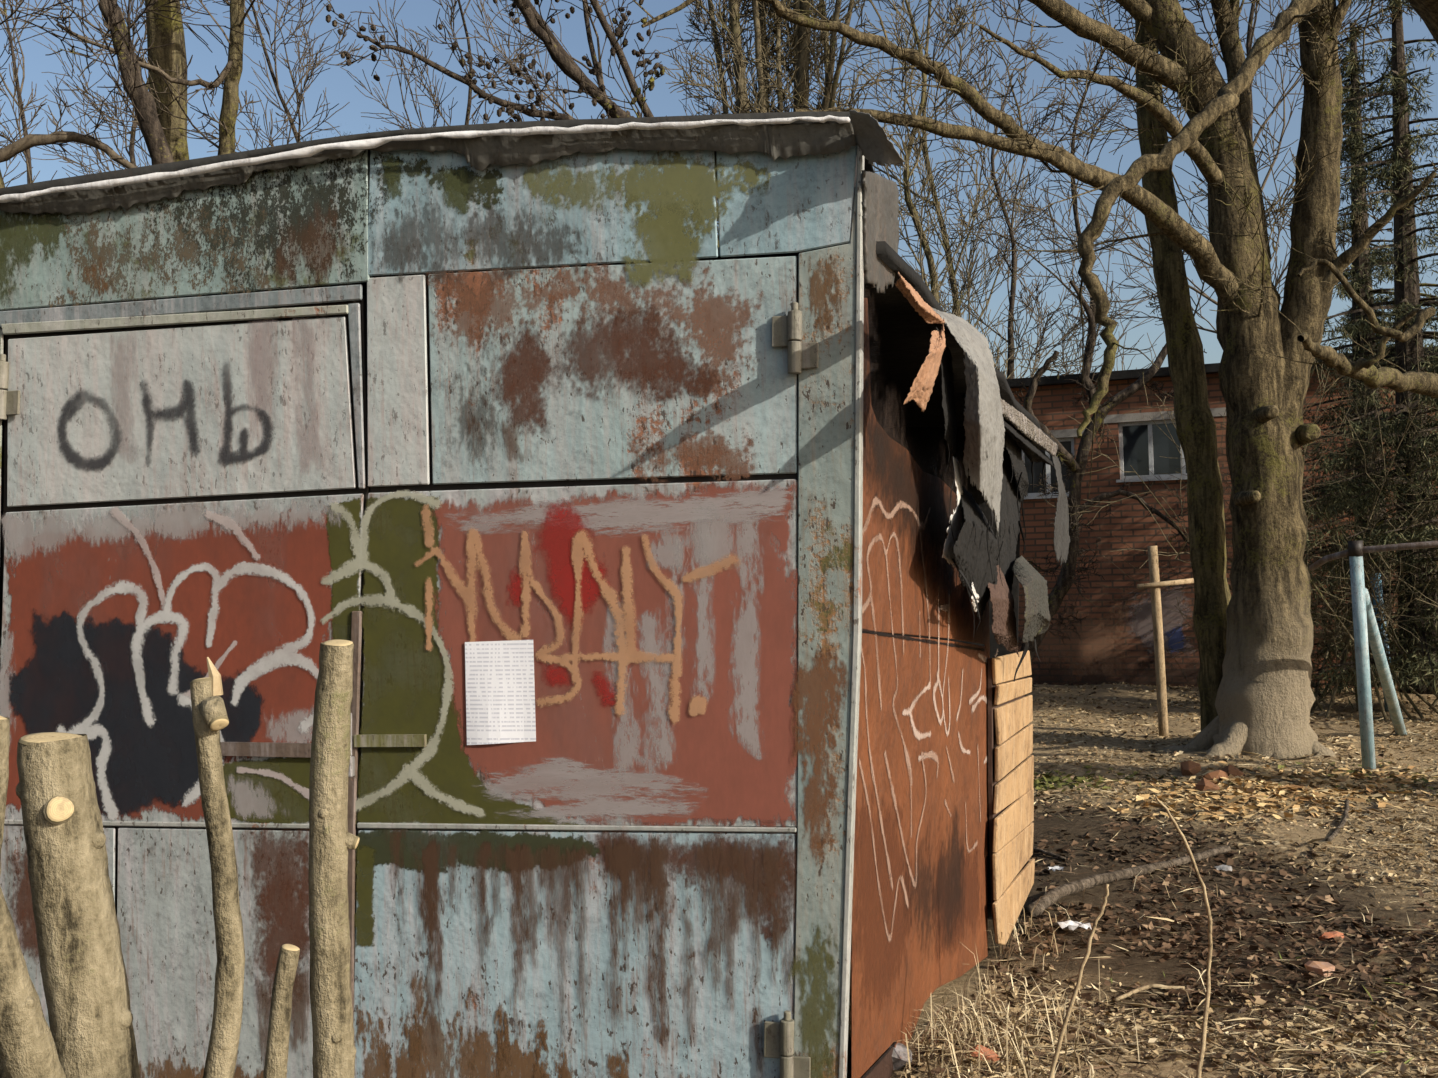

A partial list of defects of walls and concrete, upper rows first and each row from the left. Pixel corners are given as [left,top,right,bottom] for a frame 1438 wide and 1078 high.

corrosion [428,263,763,461]
corrosion [629,430,754,482]
corrosion [9,851,39,956]
corrosion [234,830,310,1078]
corrosion [354,844,575,1078]
corrosion [561,648,847,1045]
corrosion [139,1055,204,1078]
corrosion [608,1052,629,1078]